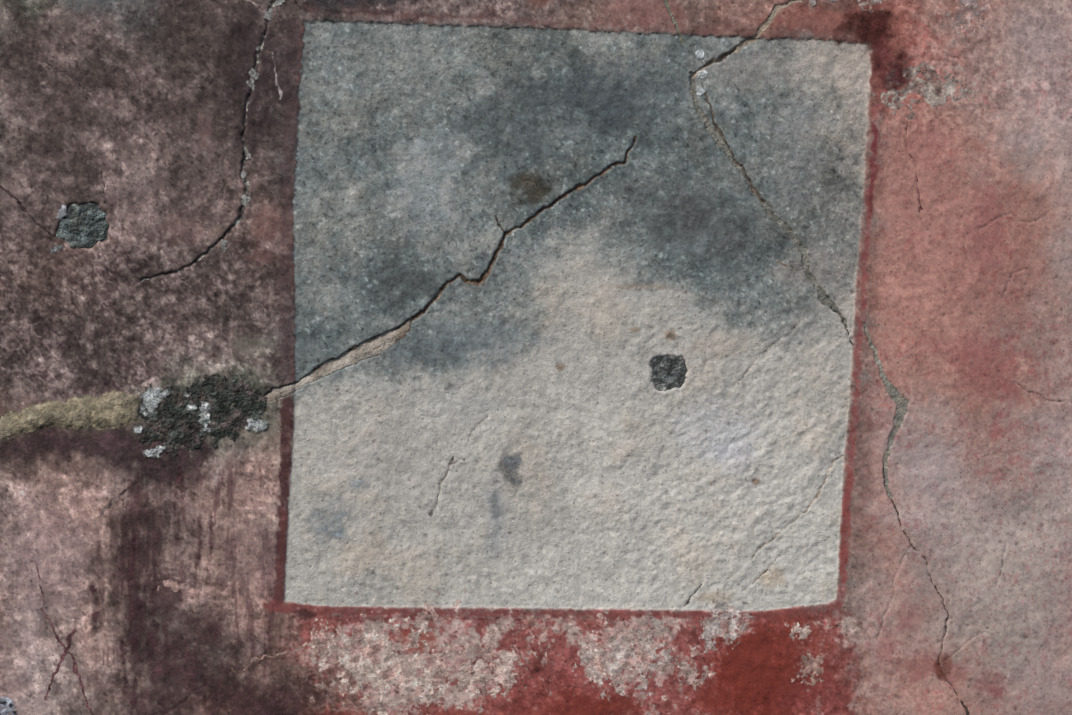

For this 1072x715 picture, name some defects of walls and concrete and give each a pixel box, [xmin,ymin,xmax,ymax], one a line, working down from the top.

crack [141,0,285,282]
crack [0,186,56,237]
crack [265,136,637,401]
crack [664,0,970,715]
crack [428,416,488,516]
peeling [231,590,547,715]
peeling [572,593,753,709]
peeling [785,622,825,691]